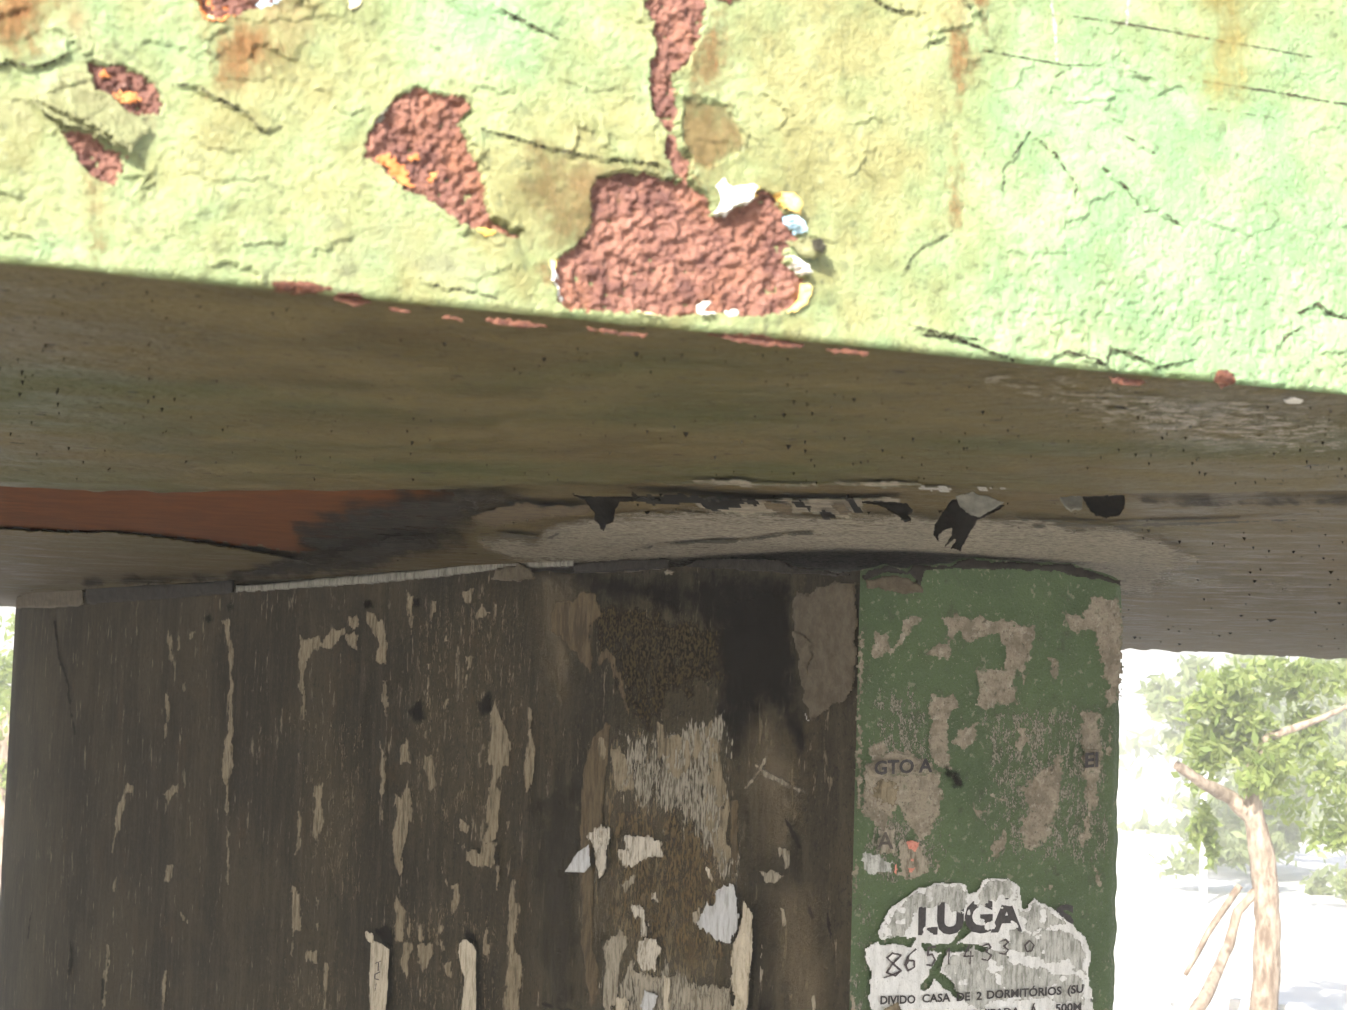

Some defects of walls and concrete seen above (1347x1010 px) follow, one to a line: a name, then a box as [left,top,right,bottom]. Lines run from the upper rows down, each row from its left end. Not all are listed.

peeling [30,80,151,152]
peeling [684,99,740,168]
crack [1002,131,1185,227]
crack [1276,302,1347,352]
crack [53,621,76,735]
leakage [595,601,794,737]
peeling [471,479,1193,863]
peeling [852,611,1060,898]